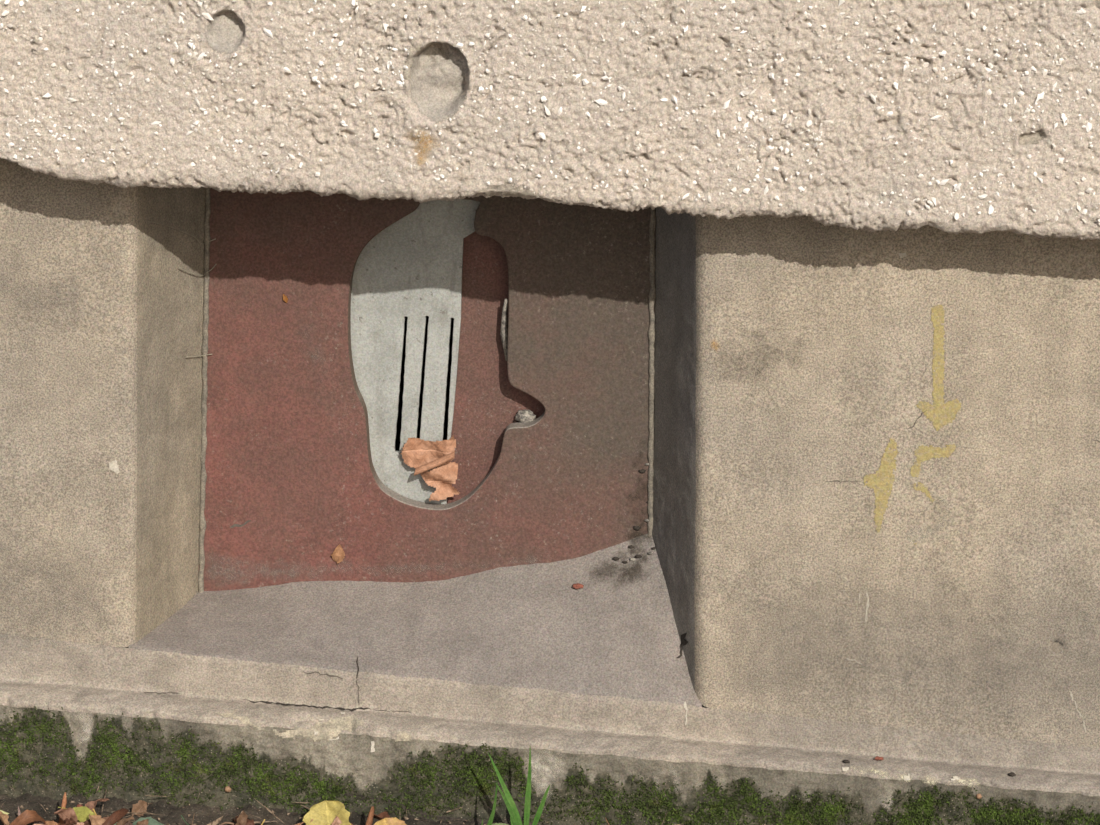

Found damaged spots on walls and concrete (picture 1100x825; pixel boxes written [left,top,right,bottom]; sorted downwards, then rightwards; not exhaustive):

spalling [0,0,845,207]
spalling [795,0,1100,226]
crack [243,656,411,713]